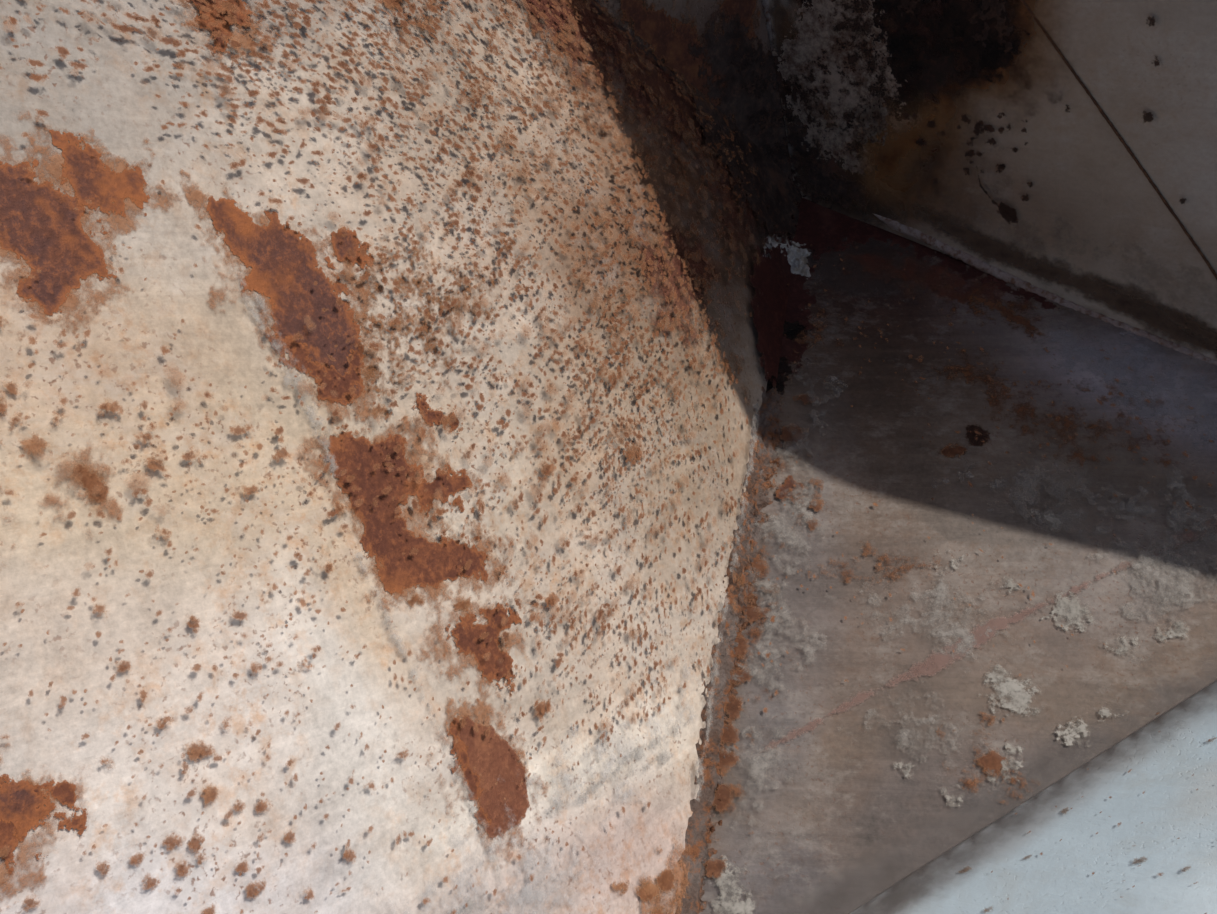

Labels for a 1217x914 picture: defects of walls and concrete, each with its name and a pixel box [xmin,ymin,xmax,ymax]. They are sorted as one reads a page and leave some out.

water stain [883,203,1217,357]